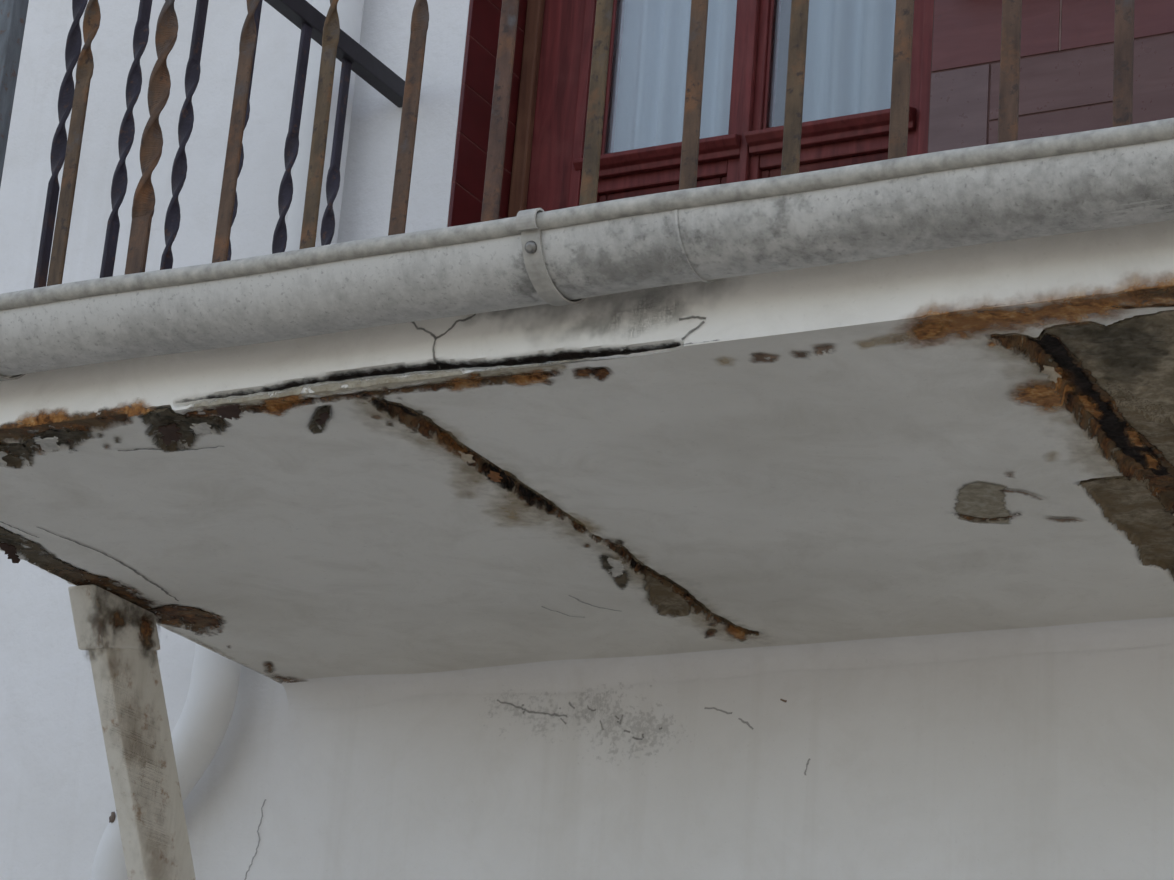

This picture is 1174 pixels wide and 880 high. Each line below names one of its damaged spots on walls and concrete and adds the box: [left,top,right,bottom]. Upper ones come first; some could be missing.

rust [859,277,1174,347]
spalling [0,370,470,469]
rust [753,353,778,363]
rust [793,345,833,358]
spalling [1040,310,1174,476]
crack [176,314,759,642]
peeling [955,473,1041,524]
peeling [0,526,224,652]
rust [89,590,155,658]
peeling [264,663,299,683]